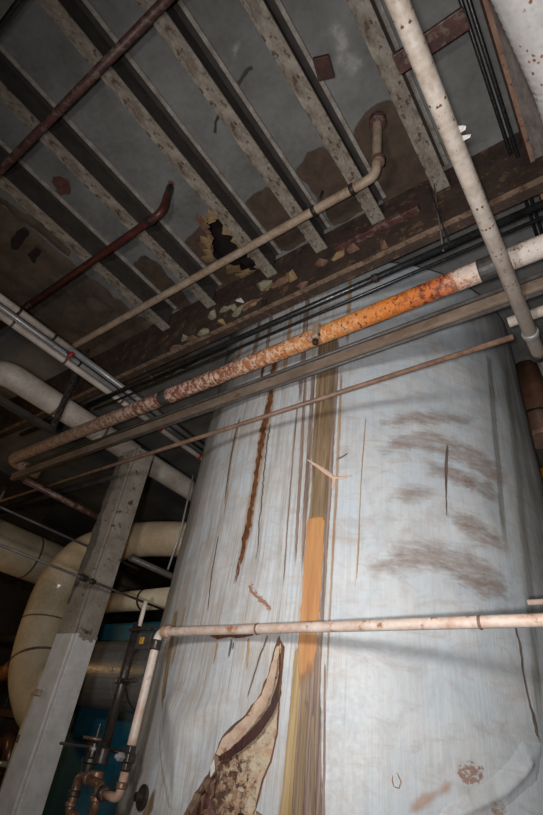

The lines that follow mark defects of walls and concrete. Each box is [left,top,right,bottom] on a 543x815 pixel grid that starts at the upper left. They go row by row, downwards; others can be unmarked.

peeling [0,197,151,360]
spalling [195,208,259,279]
water stain [246,187,306,251]
water stain [296,147,363,225]
peeling [316,243,359,266]
water stain [354,100,428,203]
peeling [115,269,308,397]
corrosion [300,334,349,367]
corrosion [283,367,342,622]
corrosion [210,623,259,666]
corrosion [280,632,330,815]
corrosion [457,761,483,784]